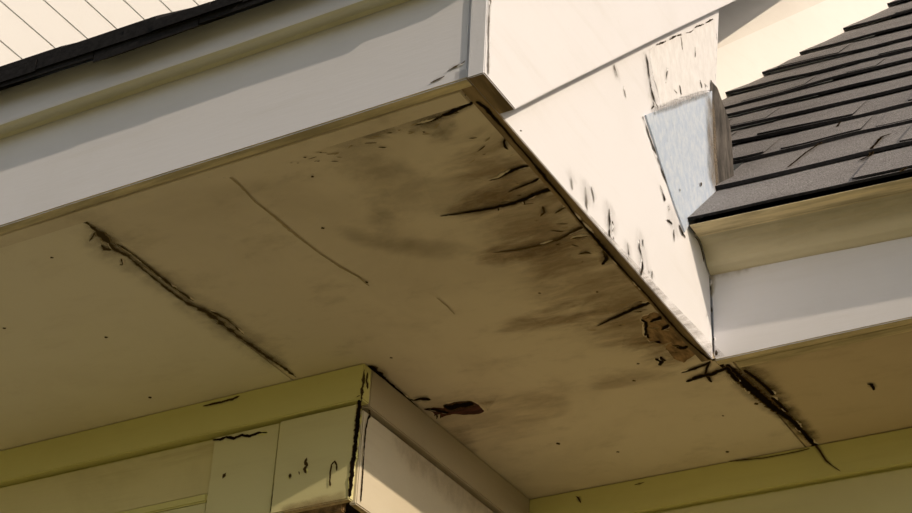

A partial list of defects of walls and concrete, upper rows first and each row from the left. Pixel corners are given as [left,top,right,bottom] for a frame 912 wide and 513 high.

crack [230,177,369,286]
crack [84,222,296,377]
peeling [640,312,695,366]
crack [681,358,741,382]
crack [203,396,239,406]
crack [213,431,268,441]
crack [357,369,371,501]
crack [288,458,337,486]
crack [729,445,840,471]